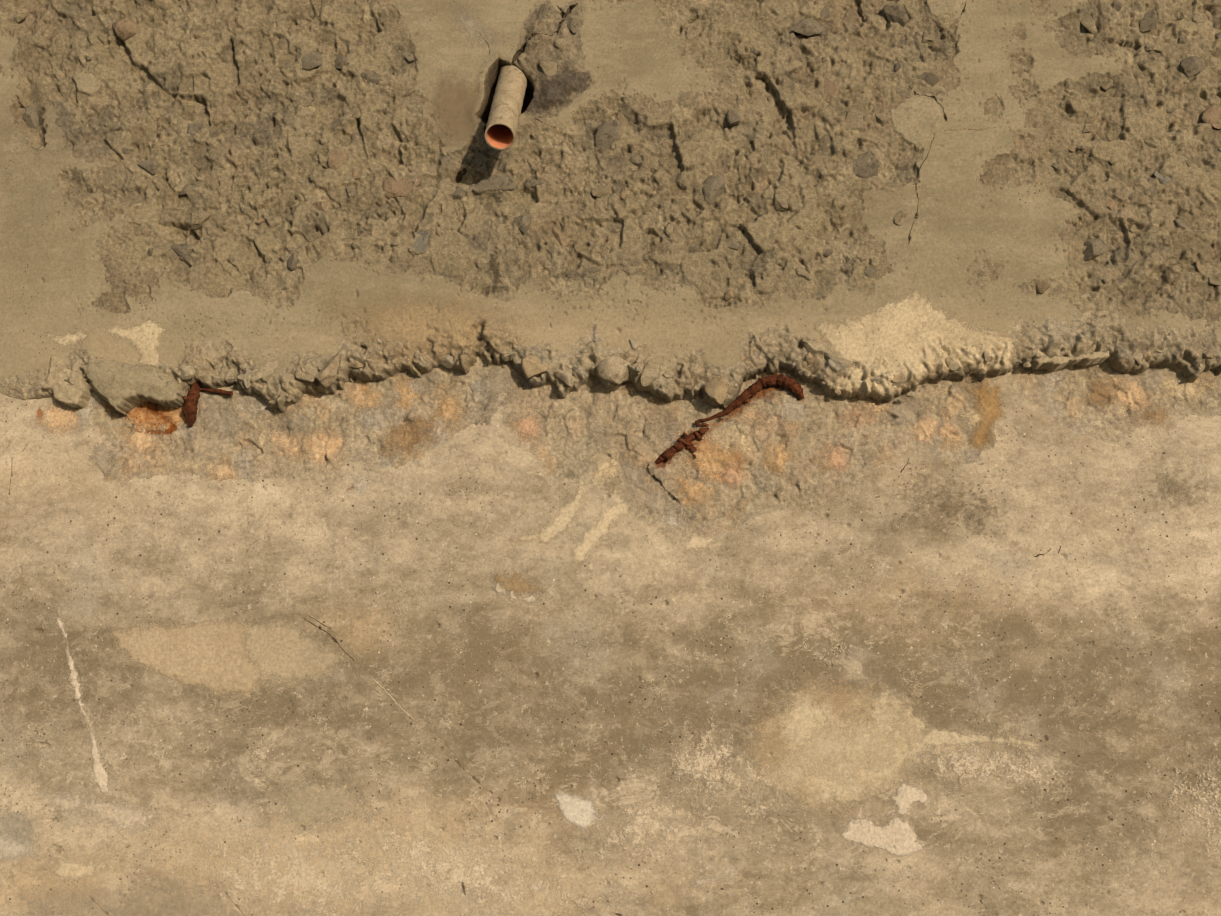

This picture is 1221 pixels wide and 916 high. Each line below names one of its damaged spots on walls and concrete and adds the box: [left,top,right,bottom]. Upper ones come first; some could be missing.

spalling [0,0,1221,538]
corrosion [105,381,233,435]
corrosion [655,374,804,483]